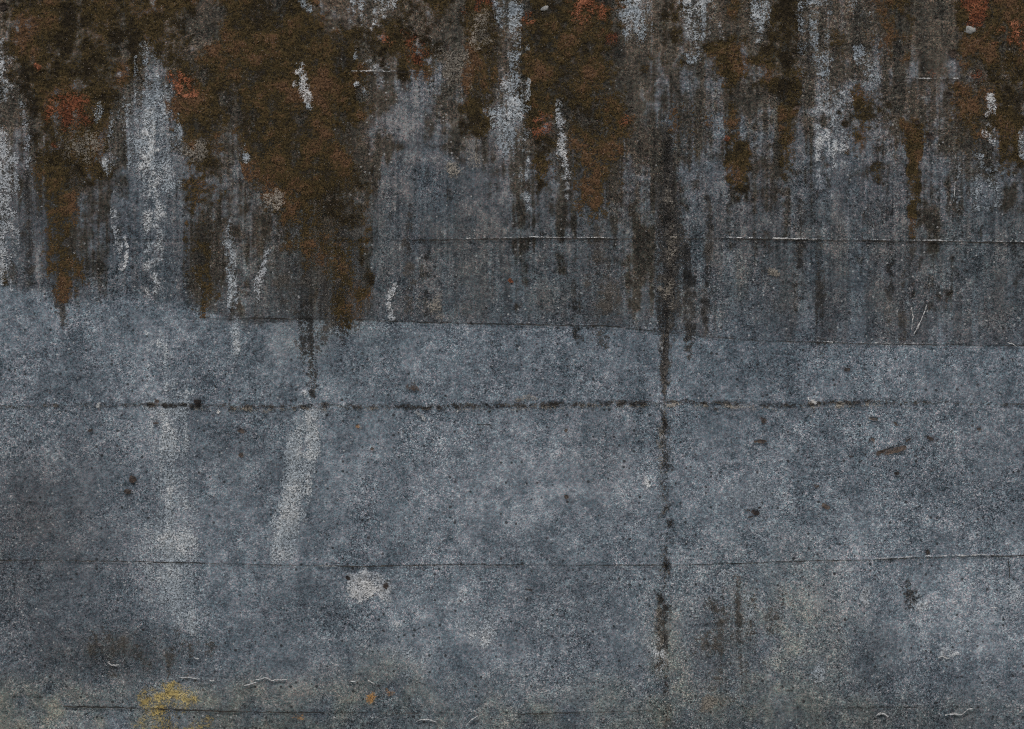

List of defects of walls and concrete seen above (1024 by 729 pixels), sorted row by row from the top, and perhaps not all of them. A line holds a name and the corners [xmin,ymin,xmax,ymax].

efflorescence [494,0,522,32]
efflorescence [619,0,649,40]
efflorescence [679,0,710,40]
damp [0,102,36,291]
efflorescence [126,47,182,295]
efflorescence [293,62,311,108]
corrosion [2,0,636,330]
efflorescence [489,51,531,158]
efflorescence [556,103,569,199]
efflorescence [815,92,846,177]
corrosion [947,0,1024,177]
damp [654,122,714,385]